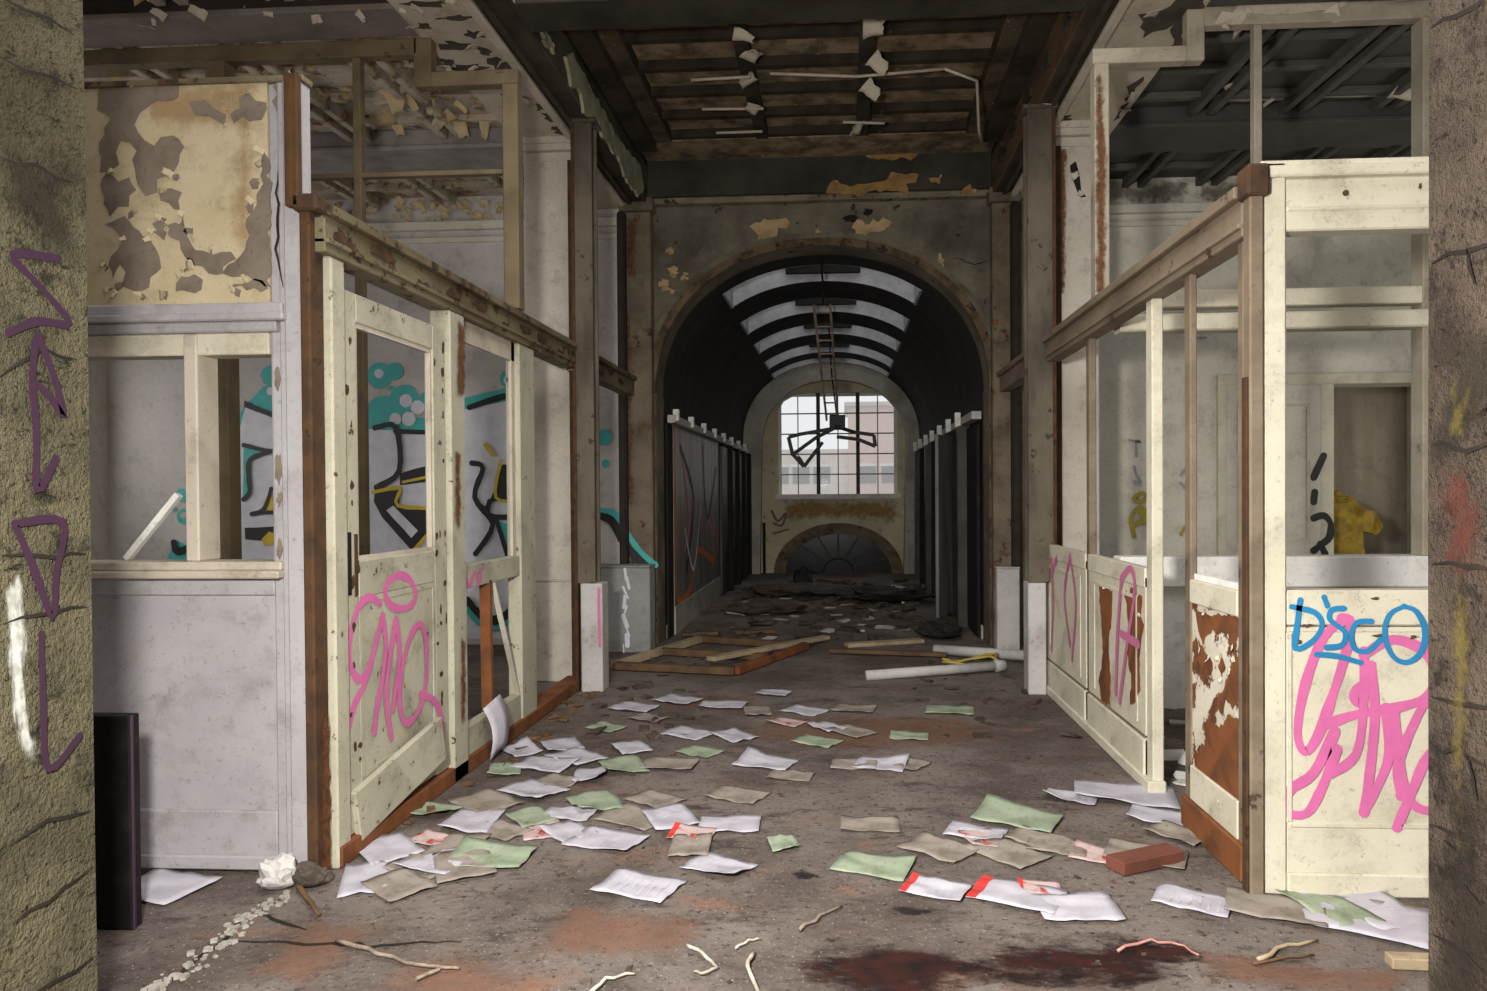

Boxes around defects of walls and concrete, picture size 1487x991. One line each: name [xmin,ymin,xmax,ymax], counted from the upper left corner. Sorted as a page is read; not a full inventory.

peeling [188,4,208,22]
peeling [399,0,512,71]
peeling [1138,0,1347,46]
peeling [348,60,490,140]
peeling [540,31,644,197]
peeling [1324,86,1411,101]
peeling [98,64,305,301]
peeling [826,154,942,196]
rust [1095,75,1107,292]
spalling [750,218,790,240]
peeling [1098,586,1144,706]
peeling [1195,610,1239,805]